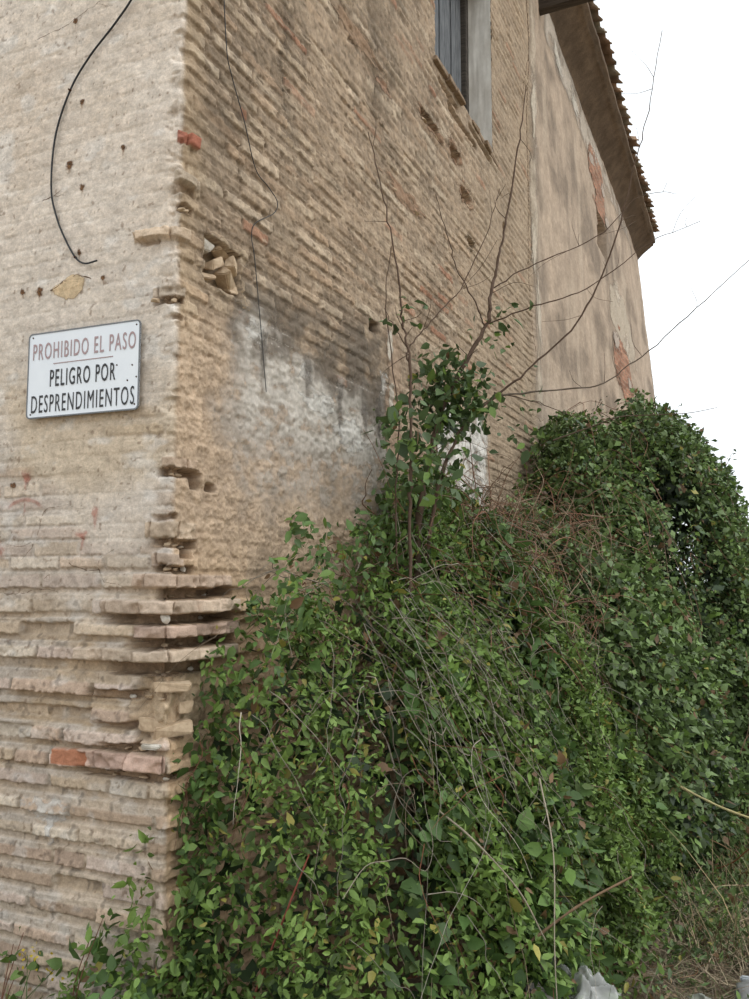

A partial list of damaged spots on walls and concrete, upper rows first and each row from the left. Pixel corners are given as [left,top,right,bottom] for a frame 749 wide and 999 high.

flaking render [529,0,628,237]
flaking render [530,150,538,270]
spalling [50,274,91,300]
water stain [252,299,325,354]
peeling [200,233,402,488]
water stain [307,327,387,429]
flaking render [610,281,637,404]